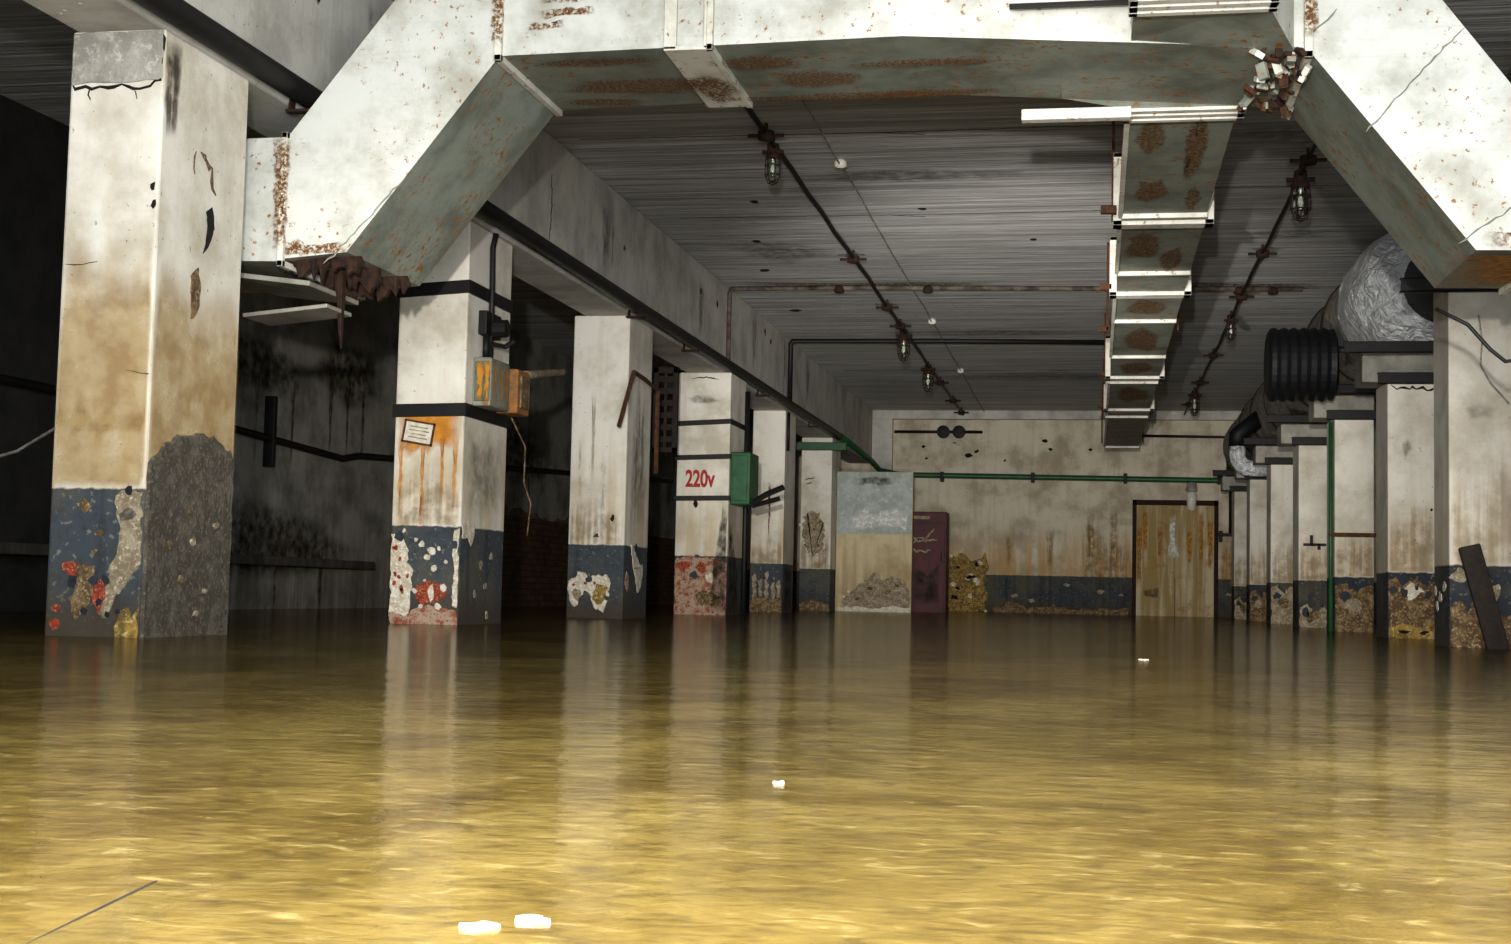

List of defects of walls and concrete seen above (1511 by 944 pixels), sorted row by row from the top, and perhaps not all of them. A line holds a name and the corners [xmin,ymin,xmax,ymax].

rust [530,0,590,30]
rust [1305,0,1319,31]
rust [273,141,344,255]
leakage [56,269,298,482]
rust [1119,301,1165,402]
rust [398,416,457,512]
spalling [48,433,234,638]
peeling [389,528,493,625]
peeling [567,571,610,612]
peeling [631,544,643,593]
peeling [674,554,727,615]
spalling [749,571,911,613]